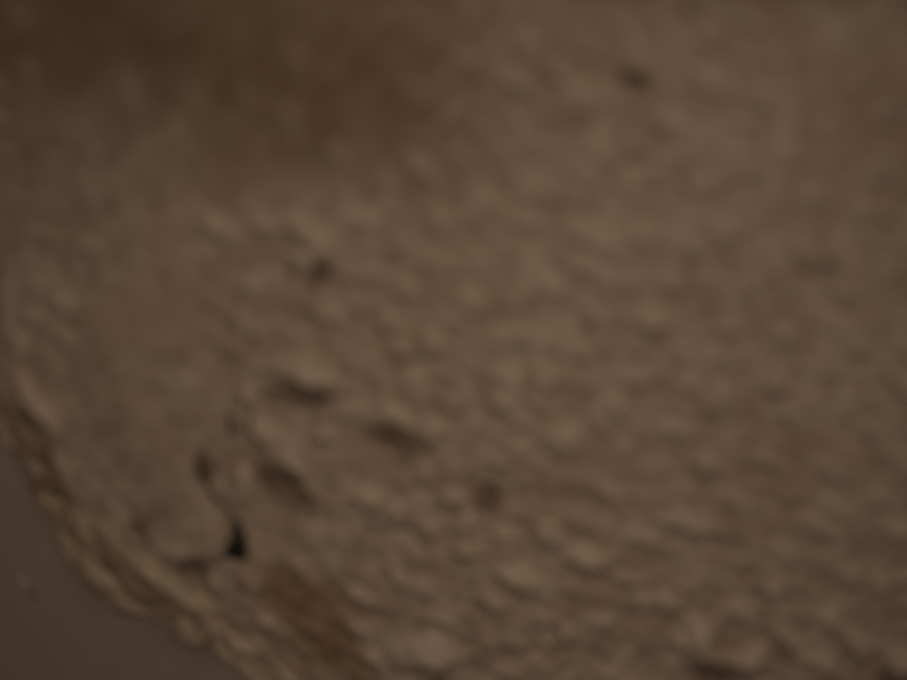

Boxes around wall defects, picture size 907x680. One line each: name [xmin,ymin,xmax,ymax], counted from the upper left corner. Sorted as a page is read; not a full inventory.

spalling [223,516,249,562]